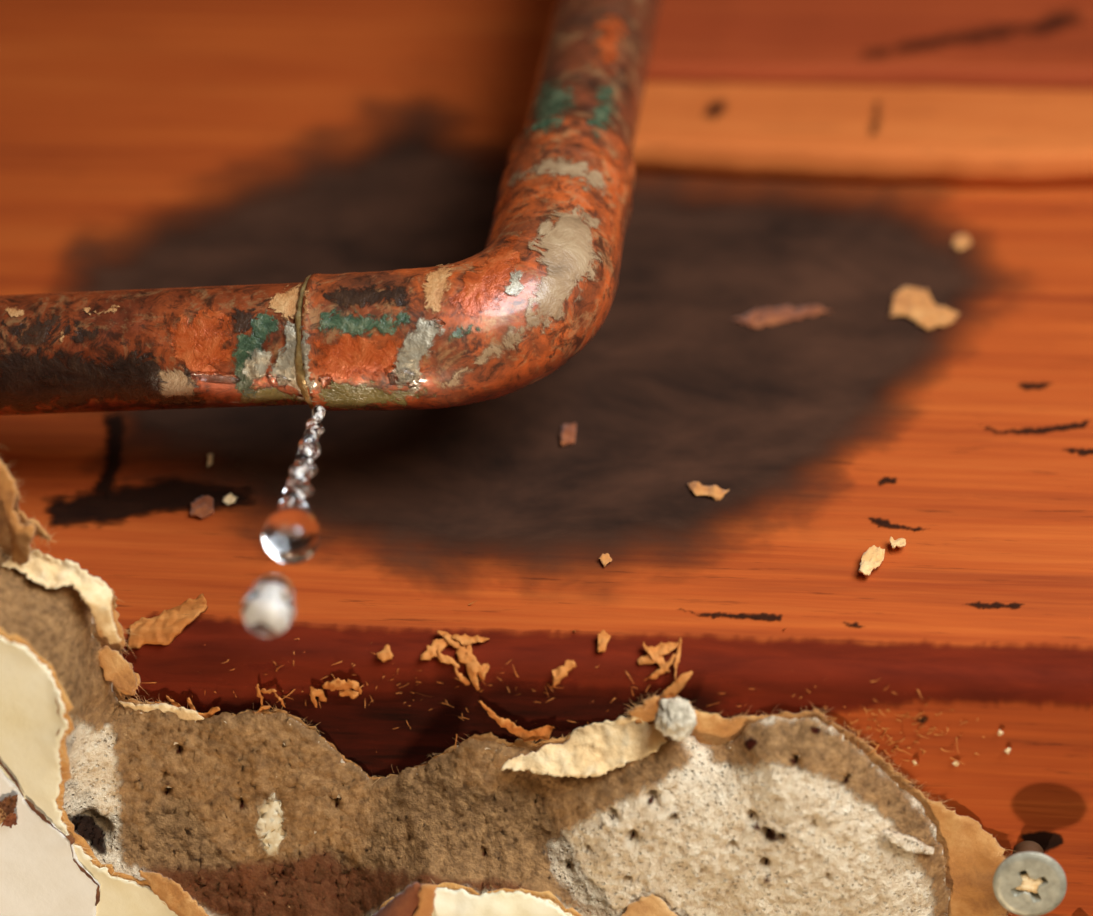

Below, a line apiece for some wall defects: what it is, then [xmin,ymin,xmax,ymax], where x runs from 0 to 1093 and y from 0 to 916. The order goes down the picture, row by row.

damp [46,415,254,525]
spalling [744,737,757,751]
spalling [0,795,18,828]
crack [0,761,100,906]
spalling [751,813,784,840]
peeling [883,829,934,855]
peeling [434,887,567,916]